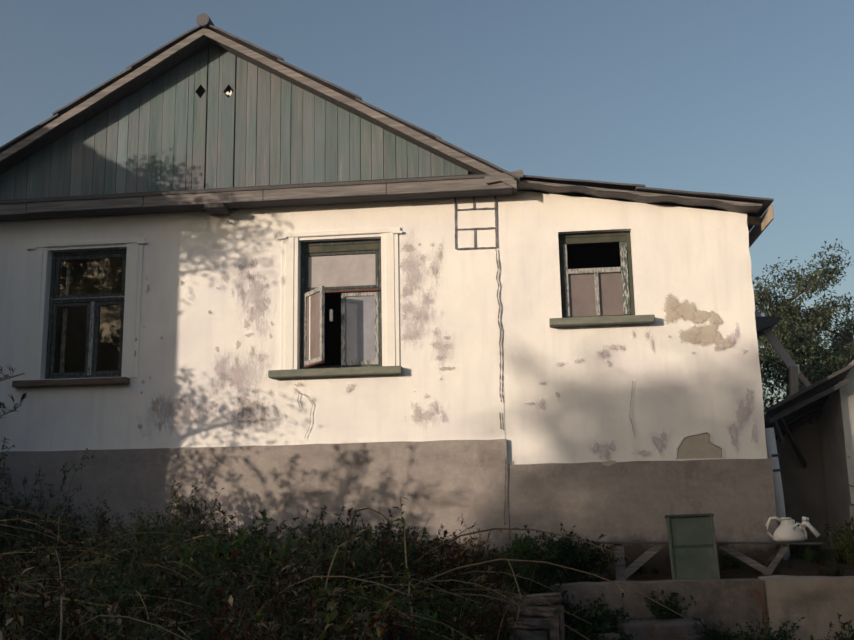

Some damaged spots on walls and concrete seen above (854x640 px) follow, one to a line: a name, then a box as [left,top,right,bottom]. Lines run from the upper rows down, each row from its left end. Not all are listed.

peeling [232,261,273,348]
peeling [401,243,433,339]
peeling [432,331,453,379]
crack [495,249,503,429]
crack [293,388,313,437]
peeling [414,394,445,421]
flaking render [674,430,724,460]